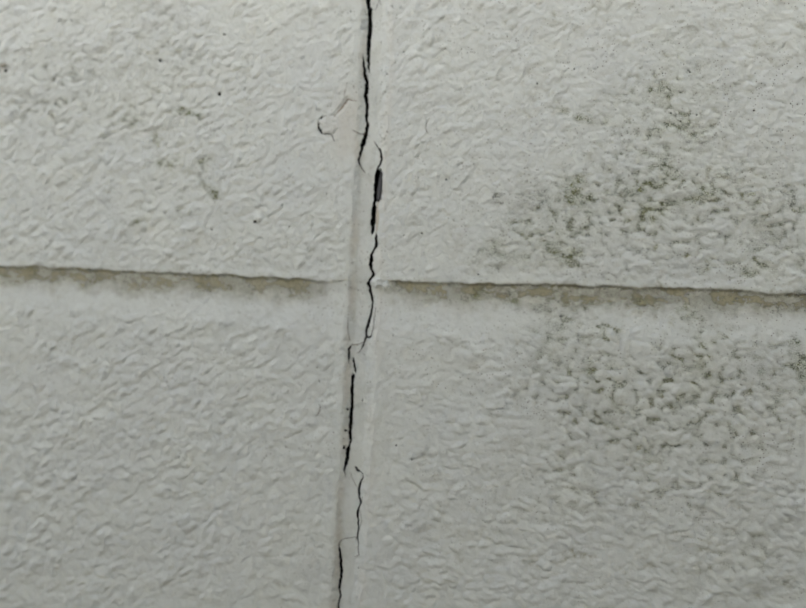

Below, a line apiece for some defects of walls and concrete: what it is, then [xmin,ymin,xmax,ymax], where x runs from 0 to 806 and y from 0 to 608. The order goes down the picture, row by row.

crack [338,0,383,608]